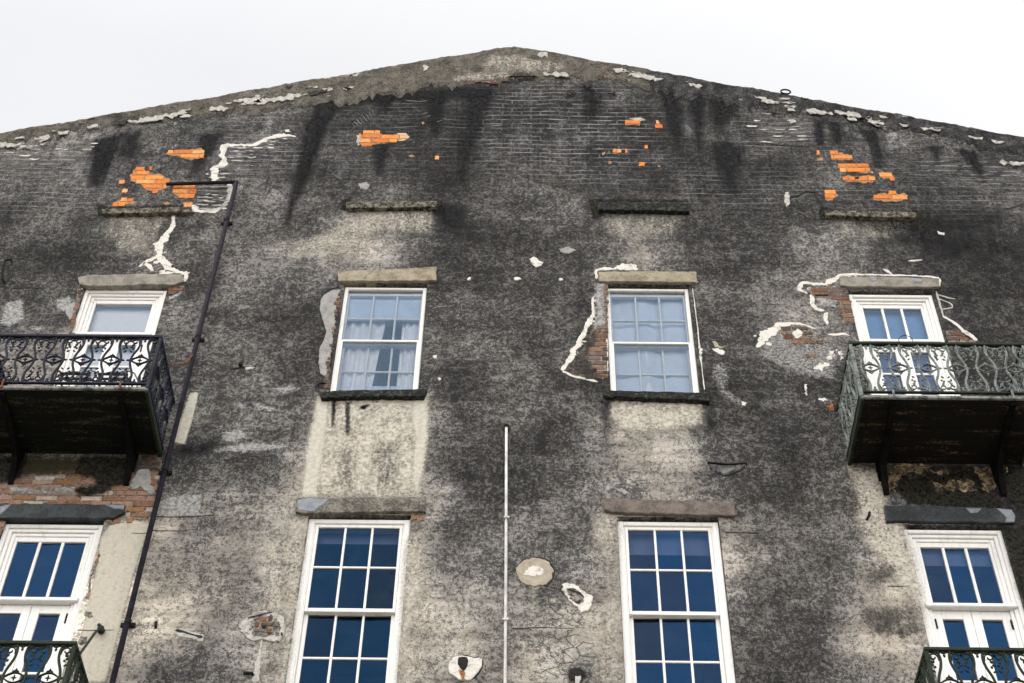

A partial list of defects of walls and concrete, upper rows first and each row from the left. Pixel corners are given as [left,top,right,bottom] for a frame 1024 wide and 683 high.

leakage [90,131,141,185]
spalling [112,166,197,207]
spalling [165,148,204,160]
leakage [187,134,220,178]
crack [139,129,296,282]
spalling [356,130,409,147]
leakage [286,88,493,228]
spalling [625,117,663,129]
spalling [784,150,908,216]
crack [561,263,638,382]
crack [754,259,978,402]
leakage [331,401,369,435]